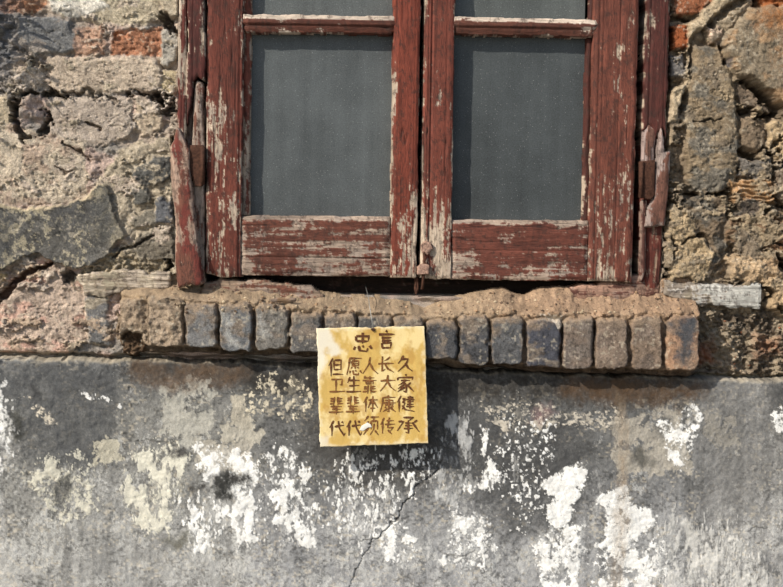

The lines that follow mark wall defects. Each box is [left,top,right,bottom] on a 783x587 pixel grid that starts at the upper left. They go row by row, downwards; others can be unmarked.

spalling [109,23,164,60]
spalling [7,86,70,145]
spalling [0,181,127,305]
spalling [117,329,149,357]
water stain [0,353,162,511]
water stain [163,443,191,460]
water stain [185,357,614,563]
crack [349,419,447,587]
water stain [156,526,197,552]
crack [435,546,476,560]